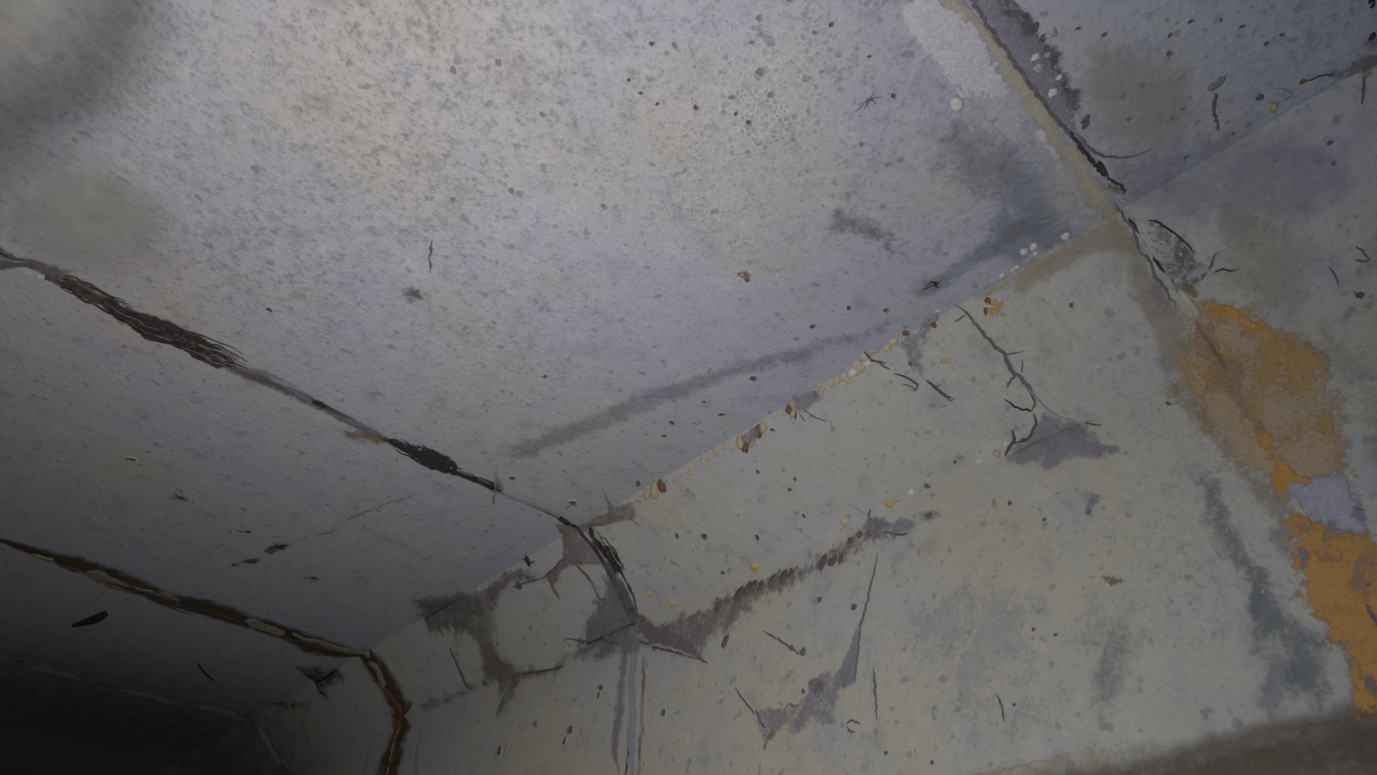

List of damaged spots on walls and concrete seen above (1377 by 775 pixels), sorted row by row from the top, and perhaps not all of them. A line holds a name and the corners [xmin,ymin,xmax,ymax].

crack [970,0,1227,371]
crack [0,249,504,494]
crack [953,304,1036,412]
crack [586,526,646,622]
corrosion [1173,299,1377,718]
crack [1364,603,1377,625]